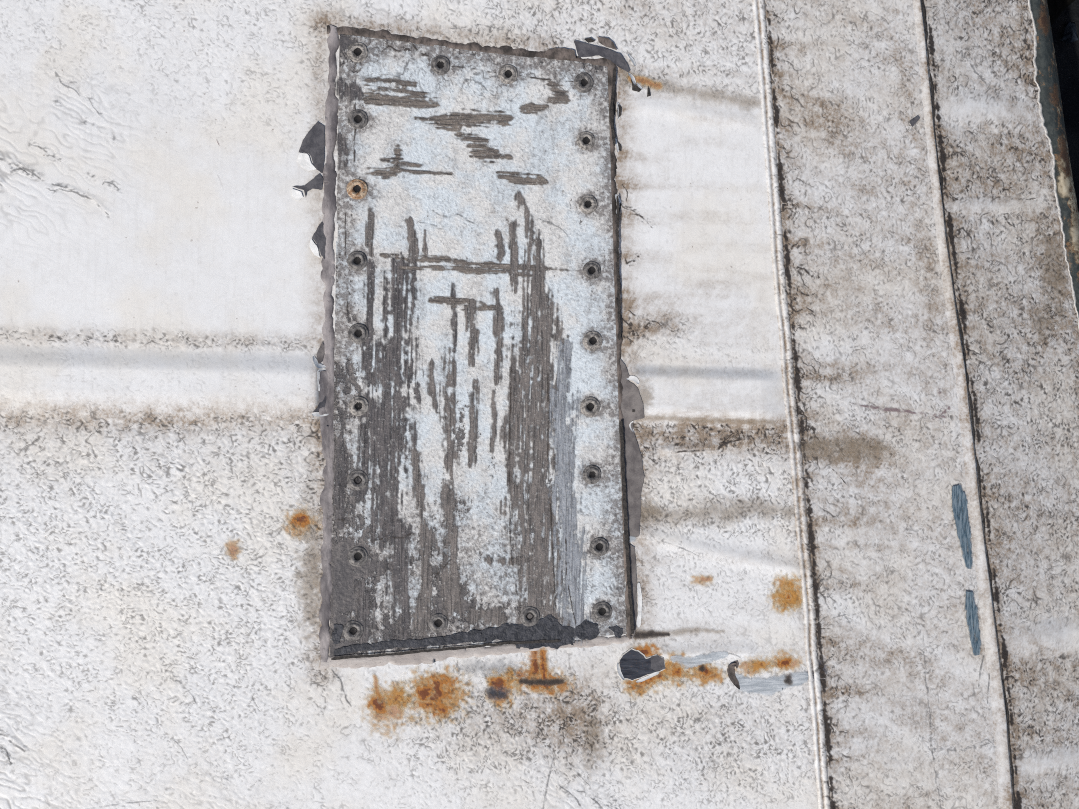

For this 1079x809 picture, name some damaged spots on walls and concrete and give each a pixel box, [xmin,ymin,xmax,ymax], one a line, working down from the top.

peeling [545,36,651,97]
peeling [292,121,348,201]
peeling [312,77,591,651]
corrosion [285,510,318,536]
peeling [620,359,644,637]
corrosion [772,577,802,612]
corrosion [367,666,470,730]
corrosion [487,648,572,707]
peeling [617,663,659,683]
corrosion [625,643,723,696]
corrosion [739,651,799,675]